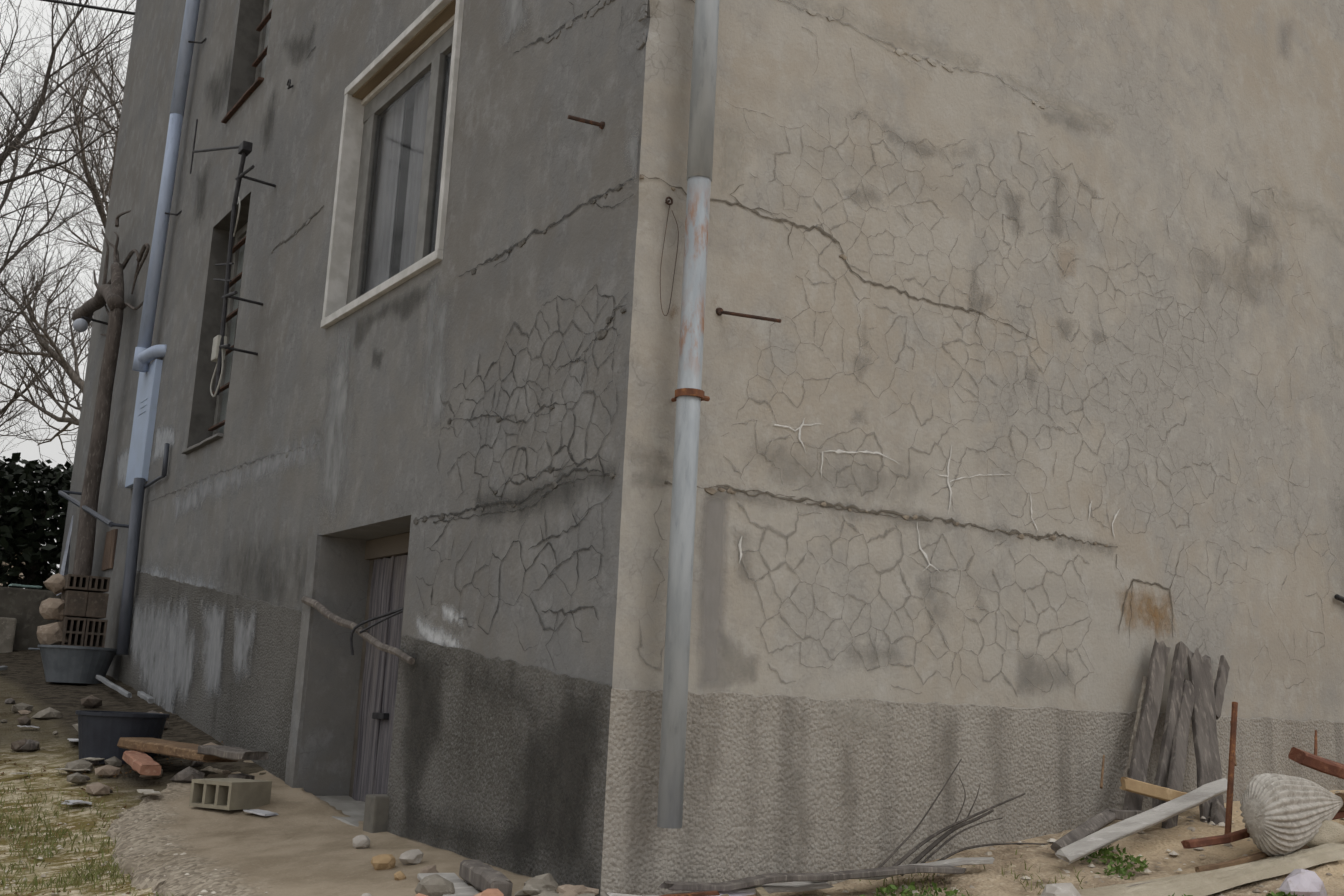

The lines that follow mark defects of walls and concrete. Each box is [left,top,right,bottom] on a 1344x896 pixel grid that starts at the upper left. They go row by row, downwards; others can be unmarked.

crack [413,284,628,669]
crack [459,0,1337,697]